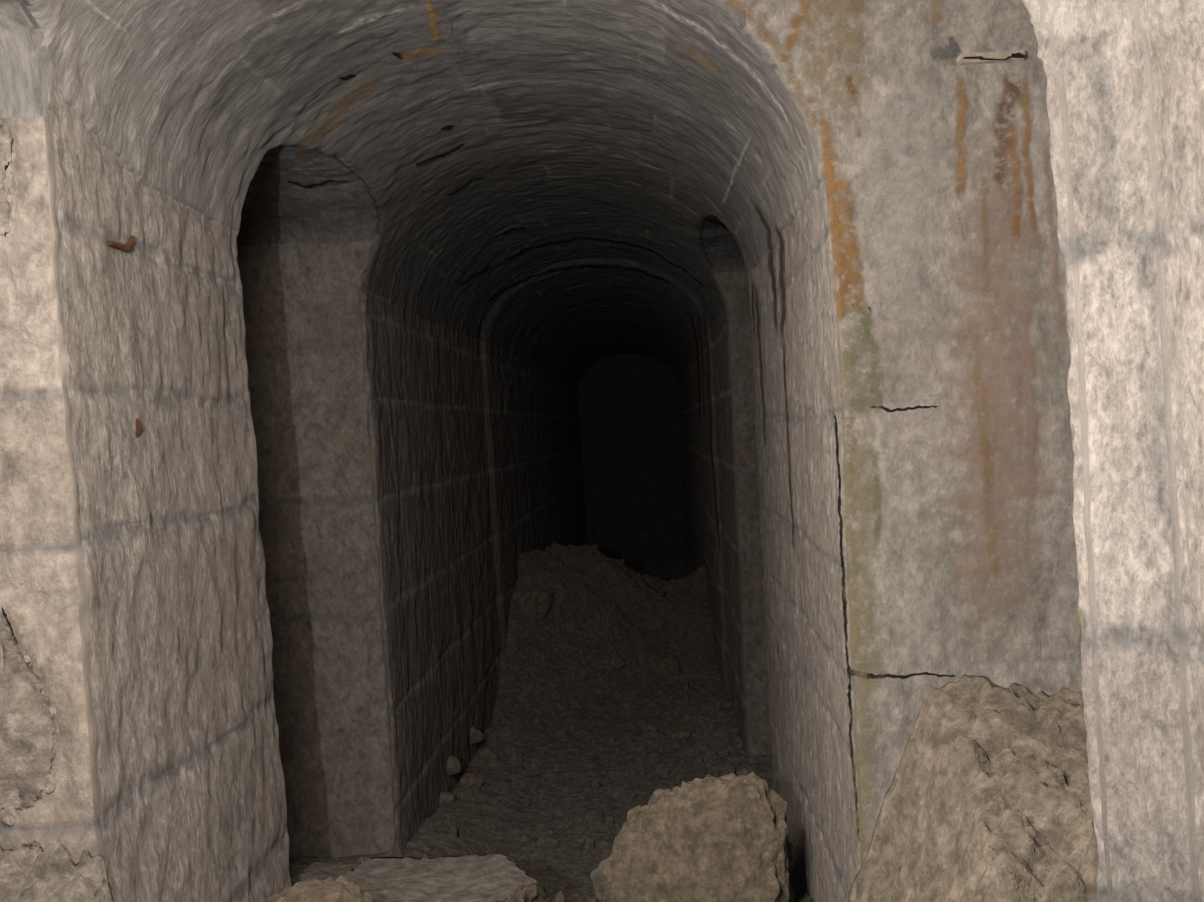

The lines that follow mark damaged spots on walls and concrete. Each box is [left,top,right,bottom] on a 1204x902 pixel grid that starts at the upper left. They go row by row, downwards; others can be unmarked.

rust [764,0,859,96]
rust [810,100,862,318]
rust [956,83,966,192]
rust [995,82,1036,234]
crack [871,404,937,412]
crack [834,415,955,841]